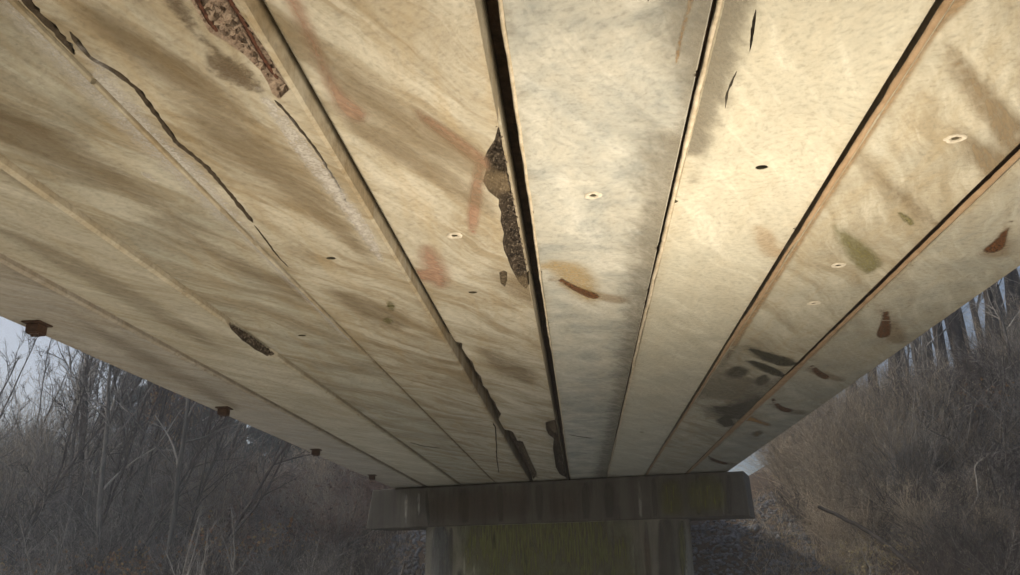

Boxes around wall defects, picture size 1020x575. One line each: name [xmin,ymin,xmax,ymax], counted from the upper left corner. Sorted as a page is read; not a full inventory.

spalling [191,0,290,100]
crack [21,0,288,267]
crack [274,100,350,208]
corrosion [421,117,487,233]
spalling [483,126,528,288]
corrosion [547,262,599,299]
corrosion [728,0,968,355]
corrosion [984,221,1012,254]
spalling [221,321,274,356]
water stain [698,349,796,427]
spalling [546,419,566,477]